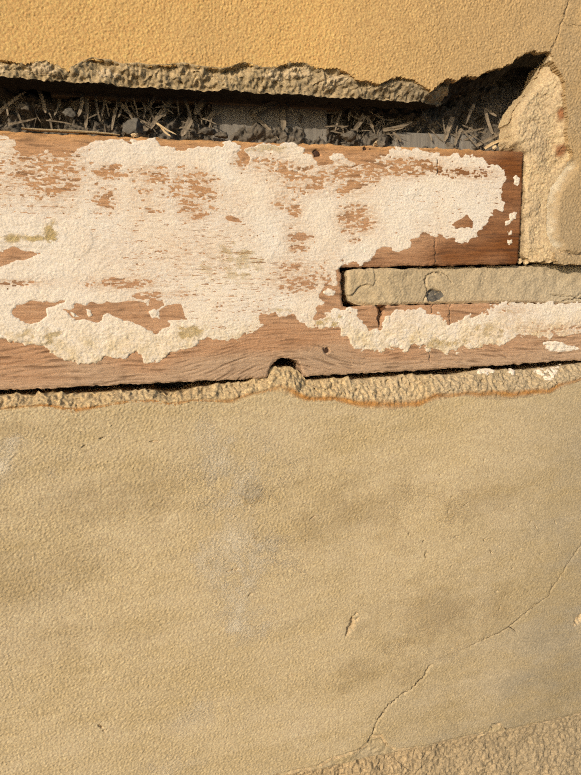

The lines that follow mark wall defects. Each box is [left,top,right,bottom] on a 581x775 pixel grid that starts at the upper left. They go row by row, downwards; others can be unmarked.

peeling [0,52,581,414]
crack [472,544,581,645]
crack [372,653,453,734]